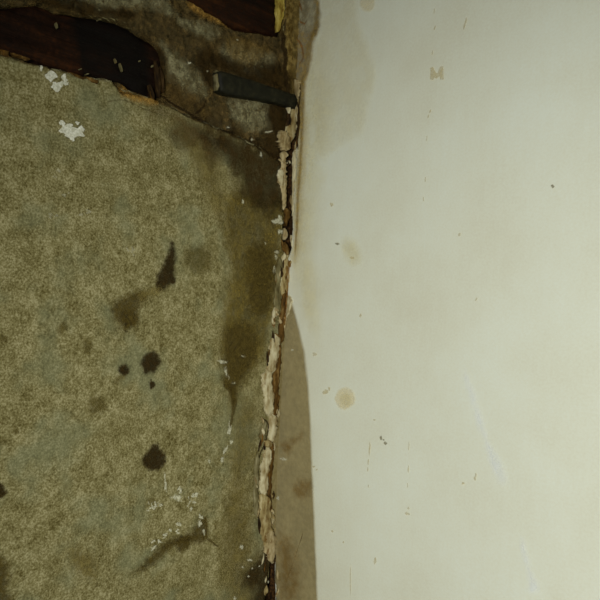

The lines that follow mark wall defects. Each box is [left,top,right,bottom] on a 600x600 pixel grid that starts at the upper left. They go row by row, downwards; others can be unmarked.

water stain [112,242,175,330]
spalling [0,0,317,600]
water stain [175,104,287,427]
water stain [141,352,161,374]
water stain [143,445,166,489]